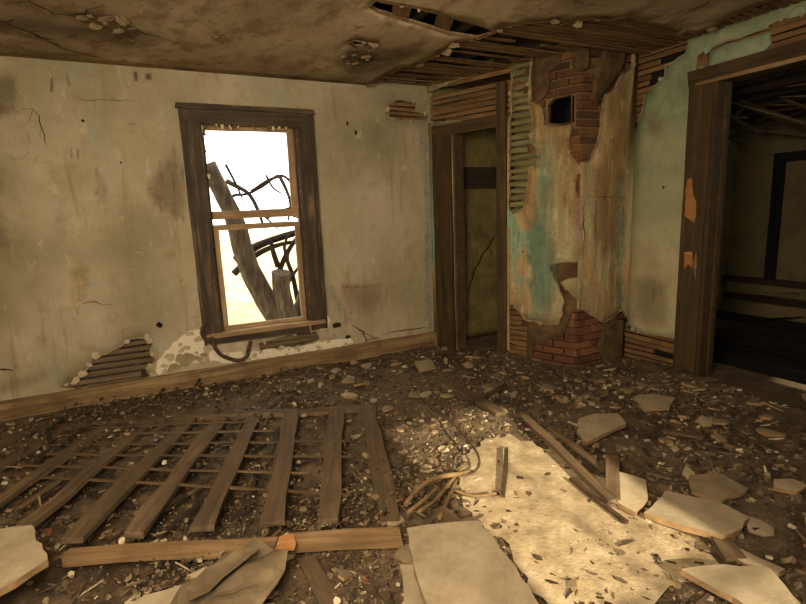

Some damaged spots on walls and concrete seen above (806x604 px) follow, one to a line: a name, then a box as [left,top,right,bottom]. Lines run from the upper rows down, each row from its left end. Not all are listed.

peeling [340,40,379,65]
flaking render [691,7,806,71]
flaking render [365,0,770,214]
flaking render [507,261,674,367]
flaking render [59,316,354,389]